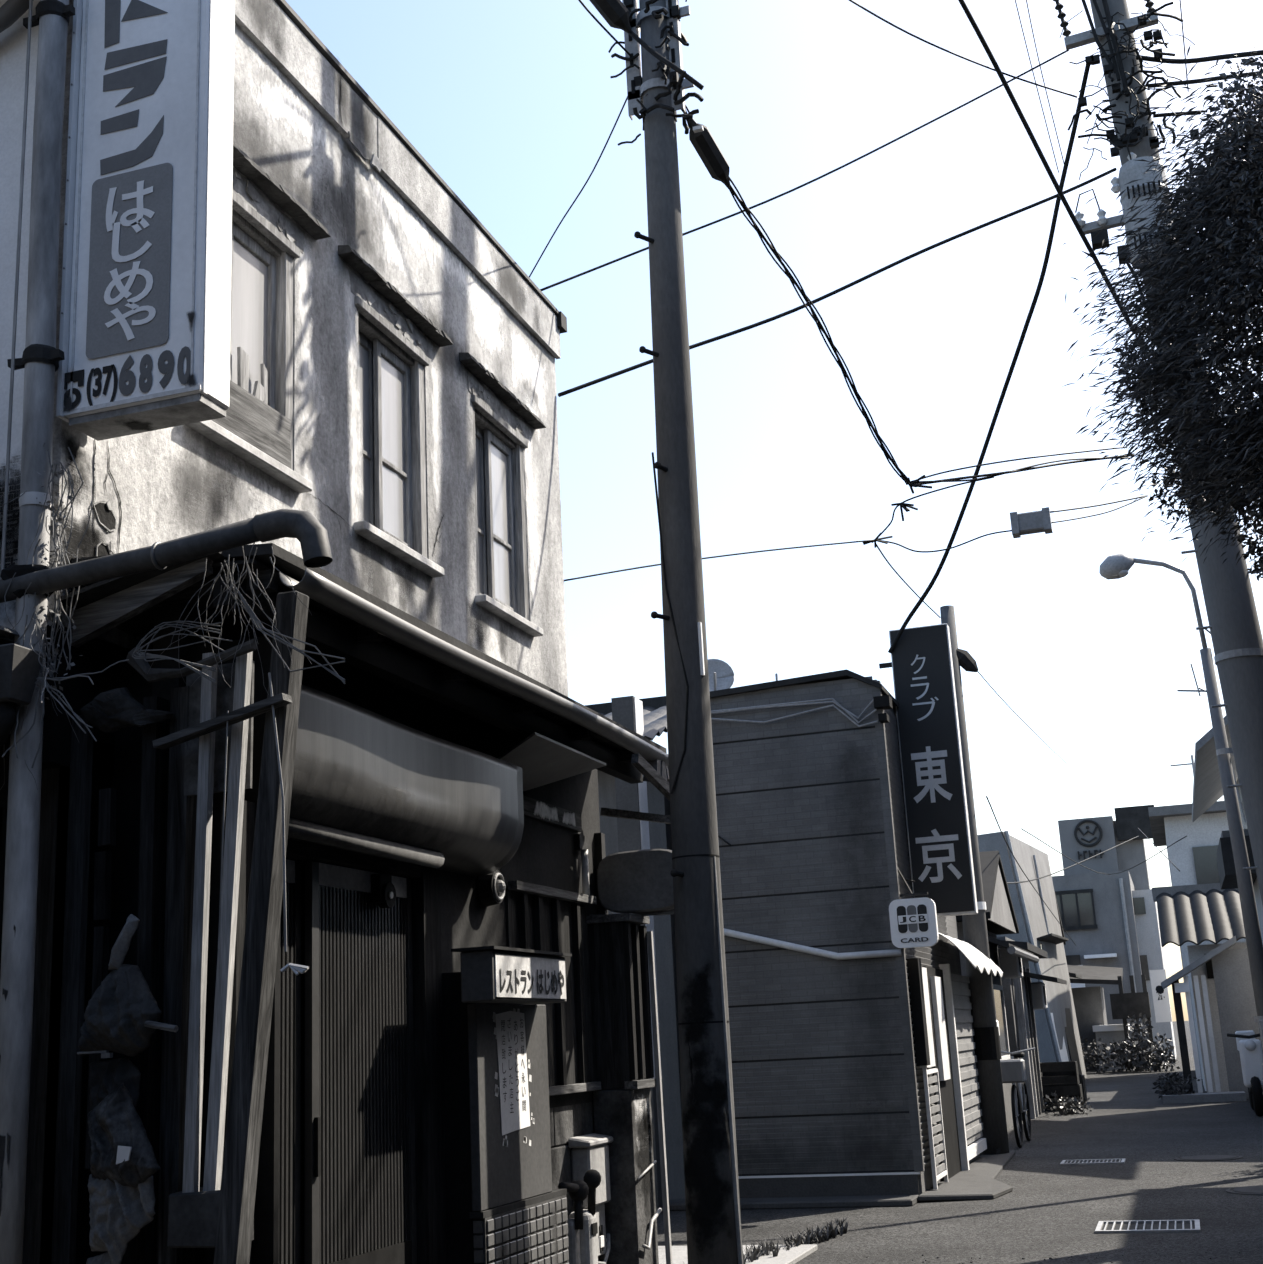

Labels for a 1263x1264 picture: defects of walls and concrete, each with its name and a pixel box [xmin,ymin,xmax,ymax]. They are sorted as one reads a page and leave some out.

water stain [249,0,280,44]
water stain [255,57,327,148]
water stain [0,466,21,572]
water stain [50,435,103,565]
water stain [180,466,297,529]
water stain [255,537,302,554]
water stain [46,584,89,641]